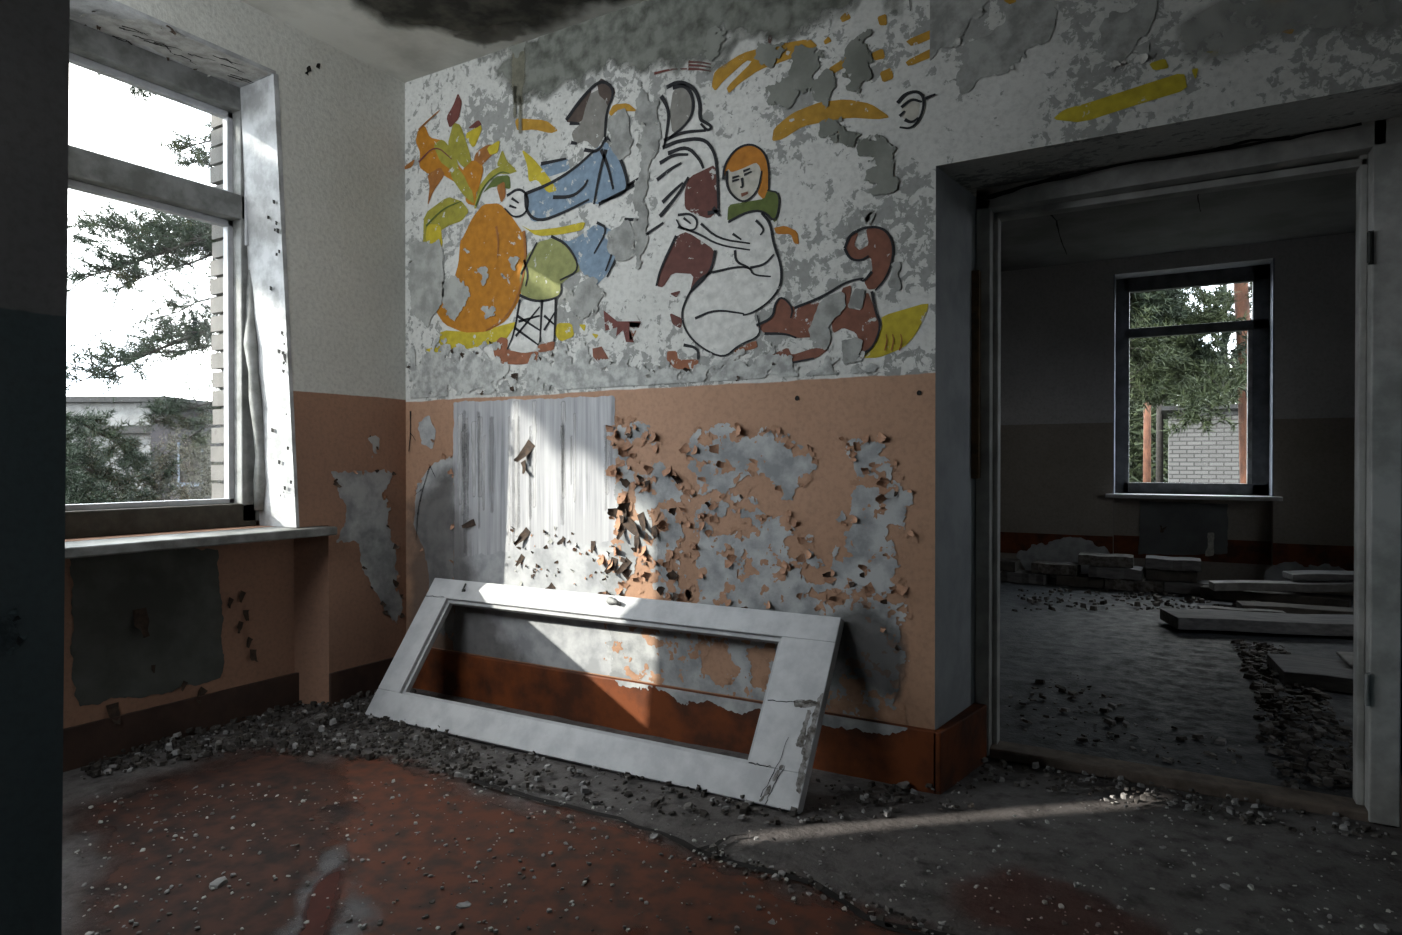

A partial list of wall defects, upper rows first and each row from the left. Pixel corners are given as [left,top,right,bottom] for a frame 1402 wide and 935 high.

peeling [606,81,661,270]
peeling [860,209,875,225]
peeling [406,237,879,398]
peeling [331,435,405,623]
peeling [413,415,918,802]